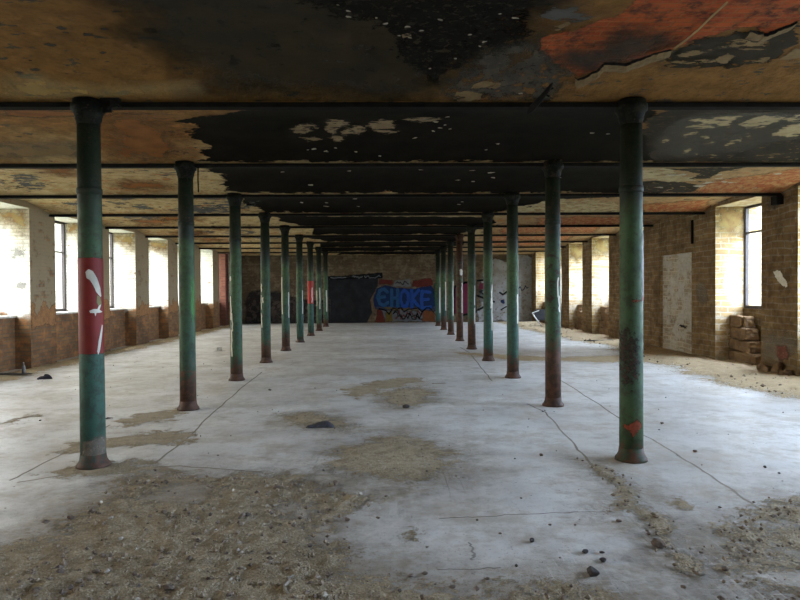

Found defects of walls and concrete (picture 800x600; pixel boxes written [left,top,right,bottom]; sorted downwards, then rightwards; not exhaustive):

damp [11,78,93,96]
peeling [453,81,501,102]
damp [441,41,575,101]
flaking render [538,0,800,89]
peeling [290,116,449,152]
peeling [642,110,800,225]
flaking render [773,270,787,288]
crack [11,452,67,482]
crack [156,372,262,472]
crack [528,404,619,489]
crack [644,435,760,509]